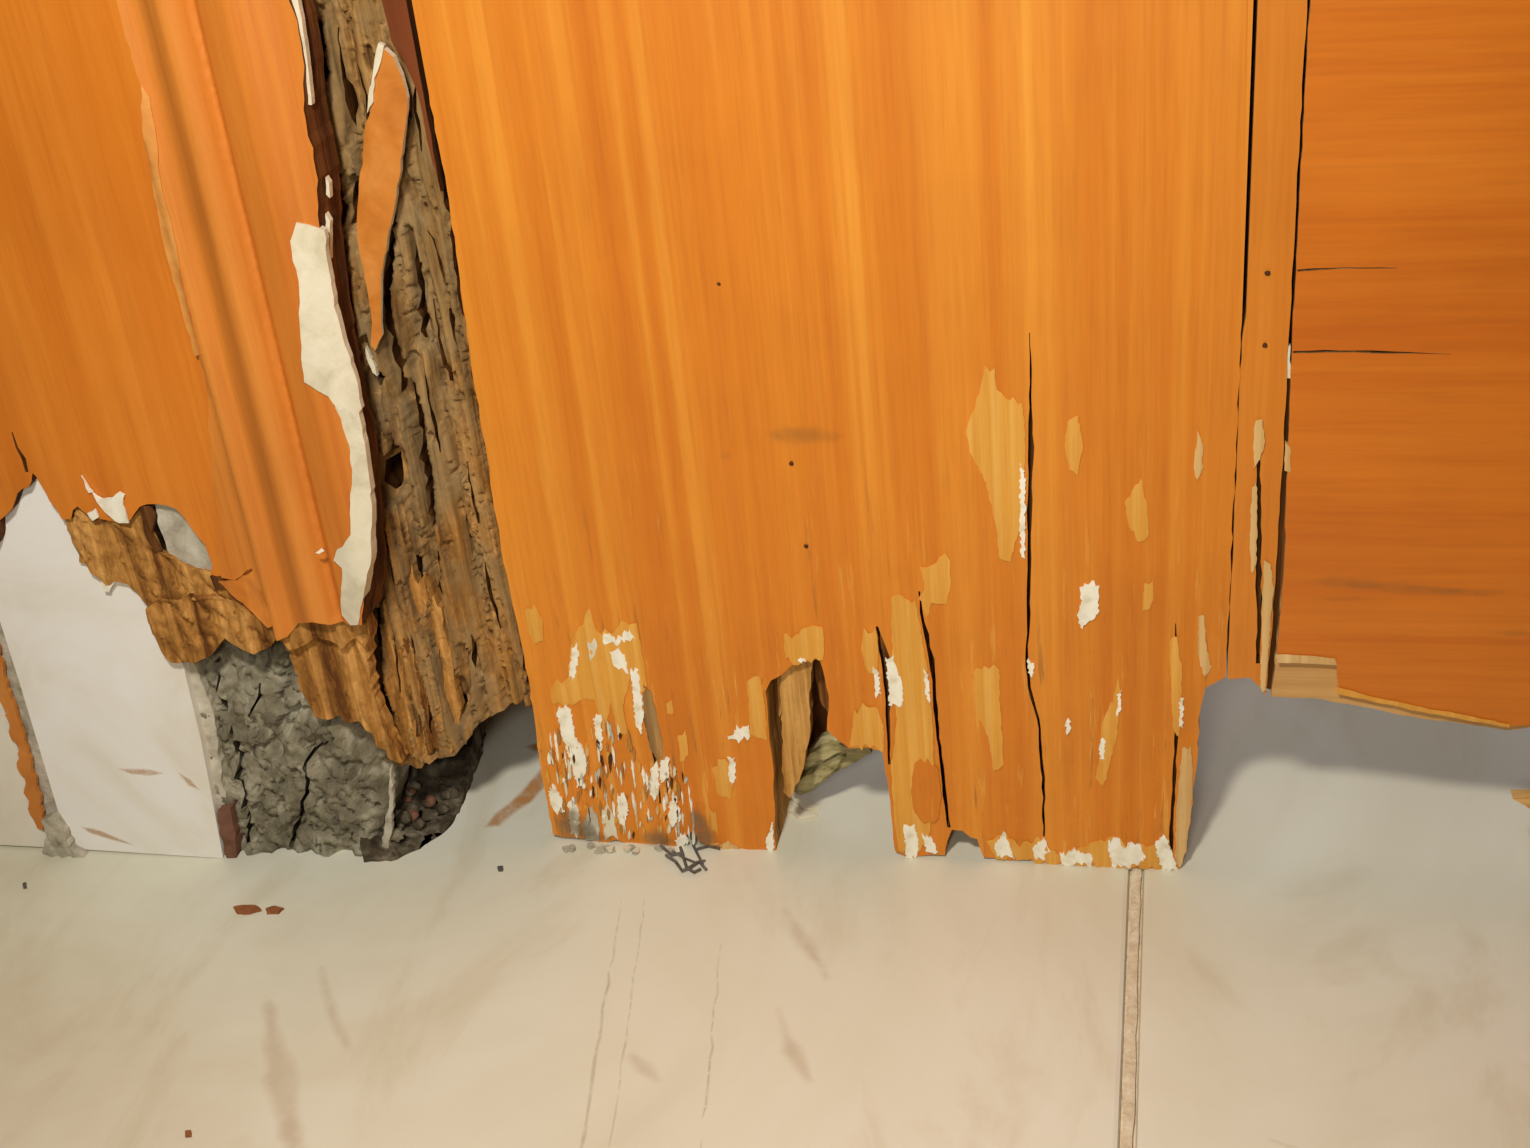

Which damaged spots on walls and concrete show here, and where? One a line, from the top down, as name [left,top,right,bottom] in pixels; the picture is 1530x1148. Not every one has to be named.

peeling [290,41,410,625]
crack [1297,265,1384,273]
flaking render [155,504,212,570]
crack [214,658,262,843]
crack [290,741,329,847]
peeling [538,609,768,849]
crack [876,626,891,764]
peeling [850,552,951,859]
crack [918,591,951,827]
peeling [966,365,1027,562]
crack [1025,333,1045,836]
peeling [986,615,1212,871]